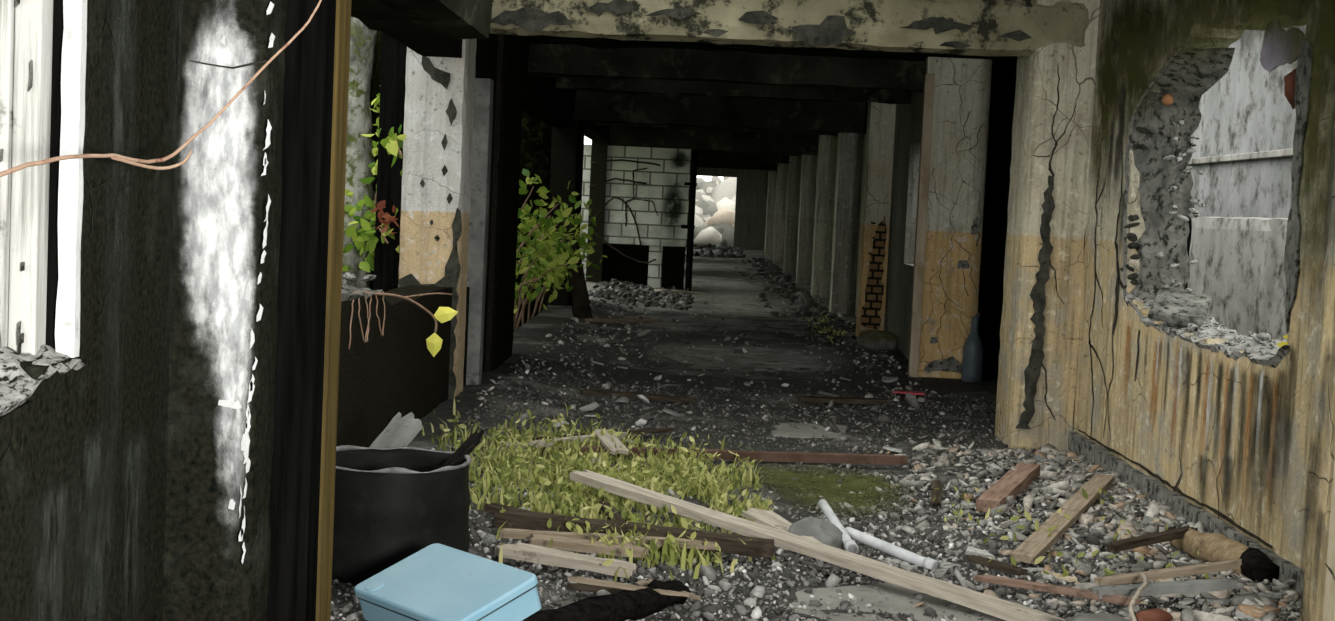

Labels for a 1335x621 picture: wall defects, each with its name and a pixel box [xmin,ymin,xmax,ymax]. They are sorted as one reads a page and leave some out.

spalling [0,321,86,416]
damp [113,0,132,262]
damp [173,0,251,478]
peeling [398,193,462,399]
peeling [421,56,457,176]
peeling [491,0,779,37]
crack [922,111,983,360]
crack [1015,65,1273,549]
damp [1093,0,1335,270]
spalling [1120,40,1314,368]
damp [1144,341,1293,509]
damp [1300,352,1333,621]